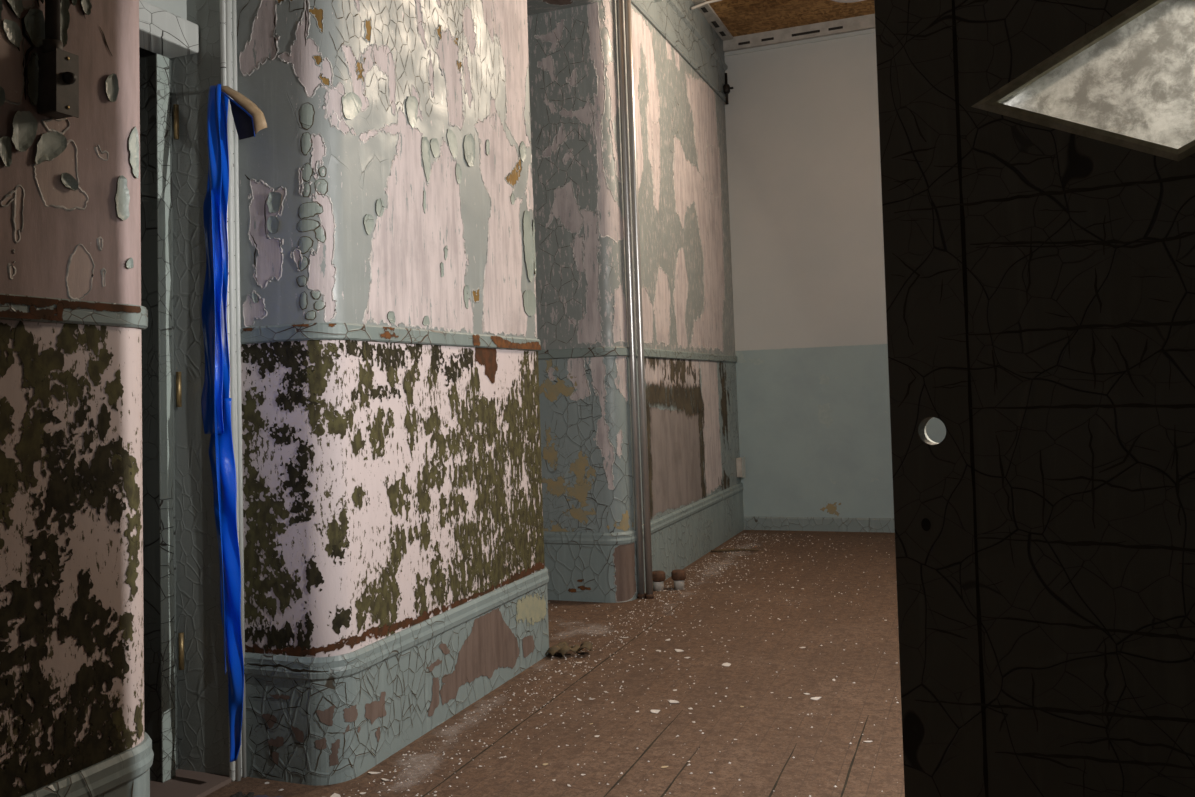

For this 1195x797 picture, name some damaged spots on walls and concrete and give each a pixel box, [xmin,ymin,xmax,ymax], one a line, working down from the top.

peeling [0,0,92,280]
peeling [65,236,106,300]
peeling [105,73,119,102]
peeling [115,126,139,221]
rust [380,327,399,339]
water stain [241,340,596,657]
peeling [239,0,628,490]
rust [473,334,541,384]
peeling [612,542,637,603]
peeling [631,8,725,517]
water stain [644,357,730,519]
crack [245,588,547,780]